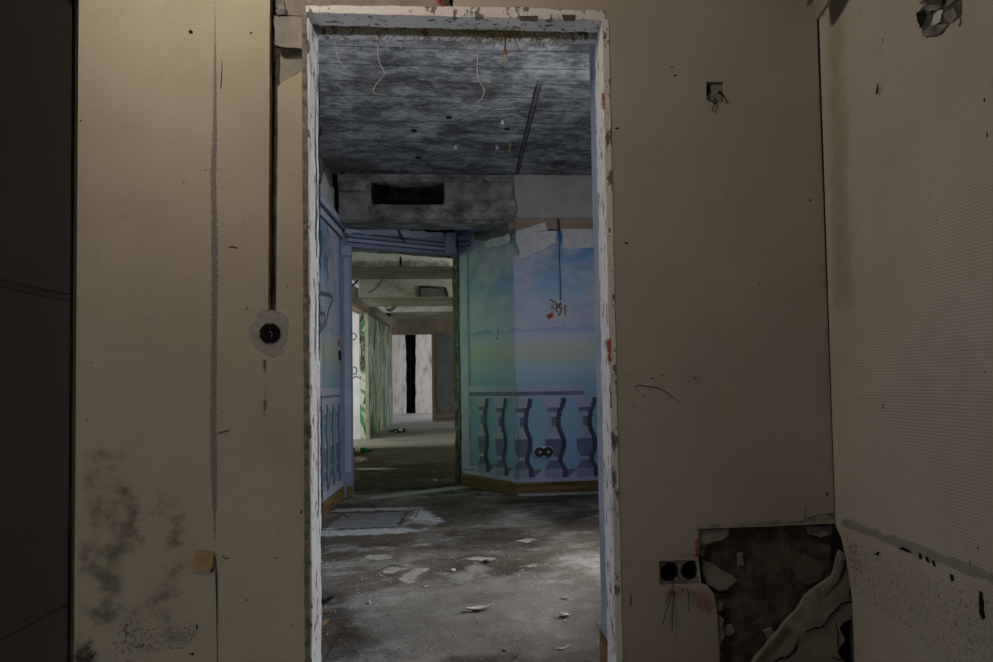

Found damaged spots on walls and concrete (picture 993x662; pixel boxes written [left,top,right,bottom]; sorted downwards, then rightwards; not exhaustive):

hole [916,0,962,36]
spalling [698,524,852,662]